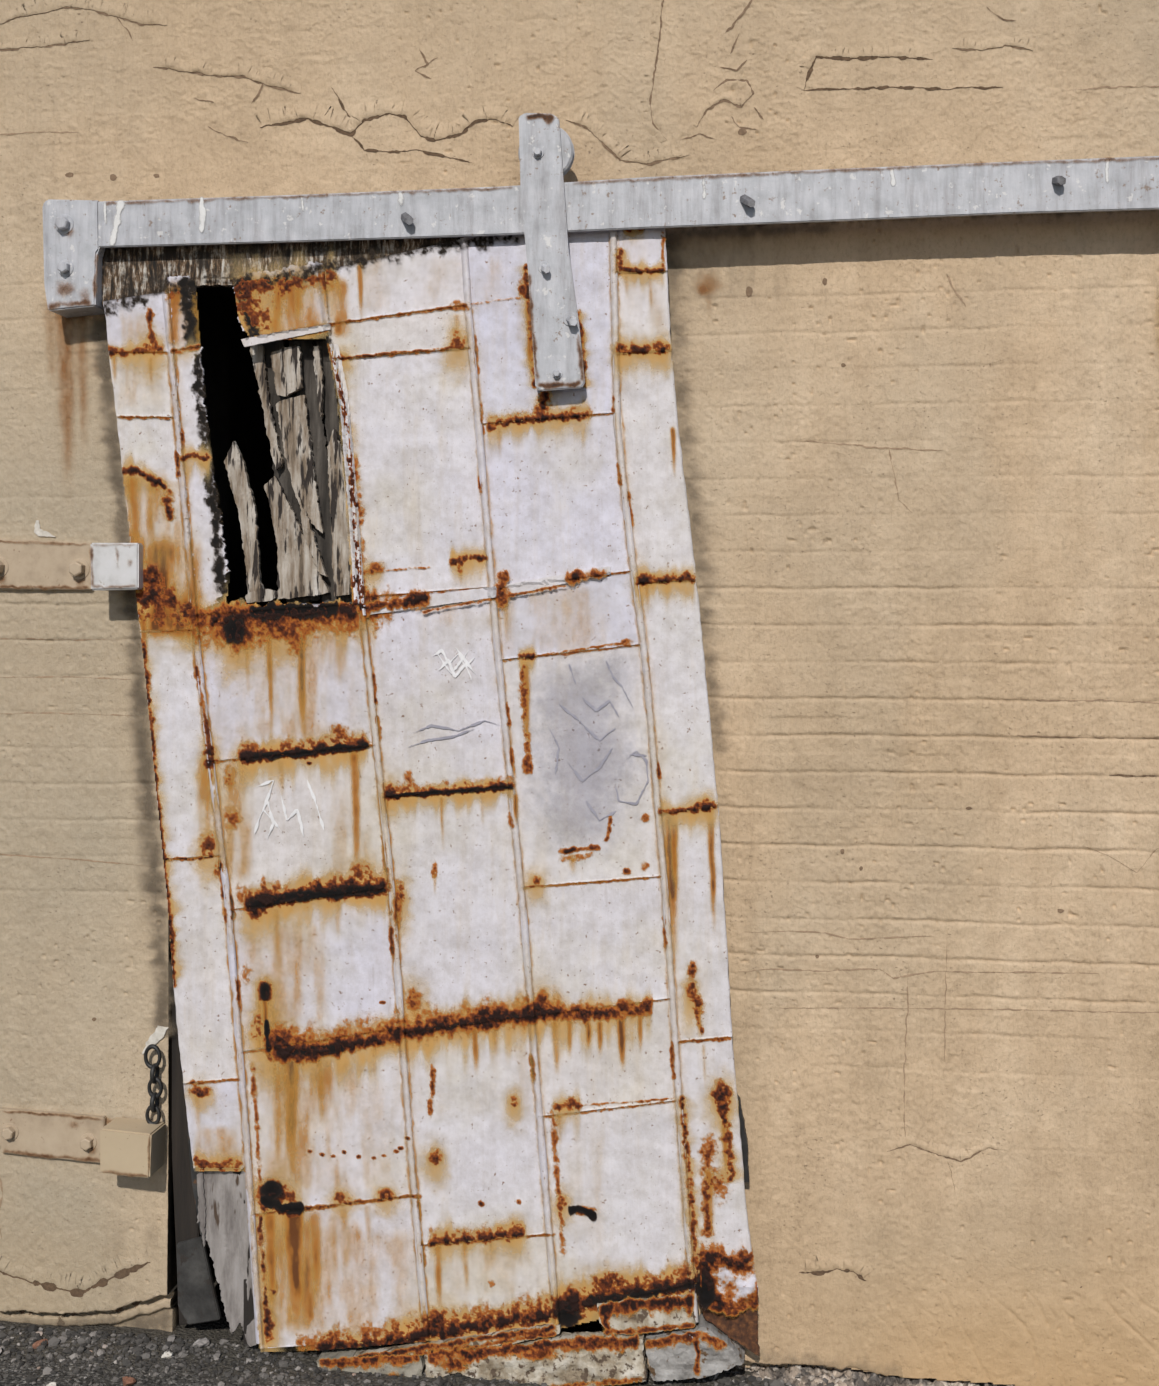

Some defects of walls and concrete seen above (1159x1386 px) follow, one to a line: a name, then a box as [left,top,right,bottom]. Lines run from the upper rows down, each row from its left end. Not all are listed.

crack [0,0,519,163]
rust [527,113,554,123]
crack [566,0,764,166]
crack [795,7,1036,91]
crack [1067,84,1159,92]
rust [0,255,760,1376]
crack [731,930,1159,1190]
crack [0,1179,159,1326]
rust [551,1376,642,1386]